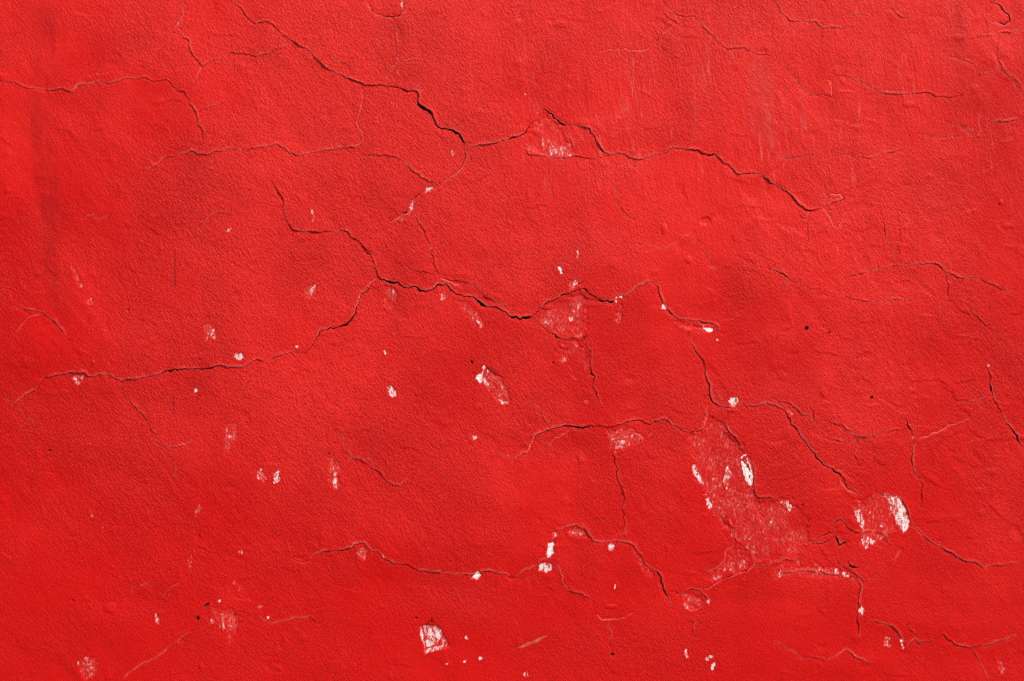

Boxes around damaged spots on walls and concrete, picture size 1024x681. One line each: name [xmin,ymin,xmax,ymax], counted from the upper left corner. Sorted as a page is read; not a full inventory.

crack [599,1,1024,140]
crack [0,0,860,479]
crack [844,212,1015,342]
peeling [471,361,513,407]
crack [333,430,412,488]
crack [497,333,1024,681]
peeling [680,394,859,611]
peeling [851,490,914,557]
crack [120,630,193,681]
crack [254,614,319,626]
peeling [415,616,486,667]
crack [294,540,633,653]